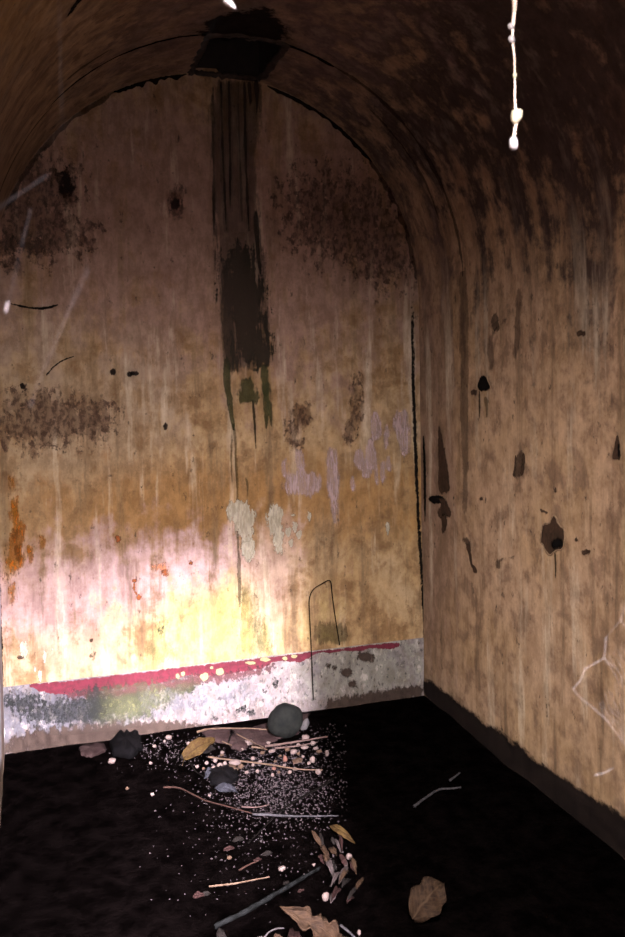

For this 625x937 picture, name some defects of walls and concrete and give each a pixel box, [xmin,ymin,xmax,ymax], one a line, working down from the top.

damp [215,80,276,446]
damp [270,158,417,303]
damp [0,383,129,458]
damp [284,401,313,448]
damp [344,372,364,443]
rust [2,476,46,604]
peeling [226,499,302,562]
peeling [17,641,28,659]
peeling [29,642,400,700]